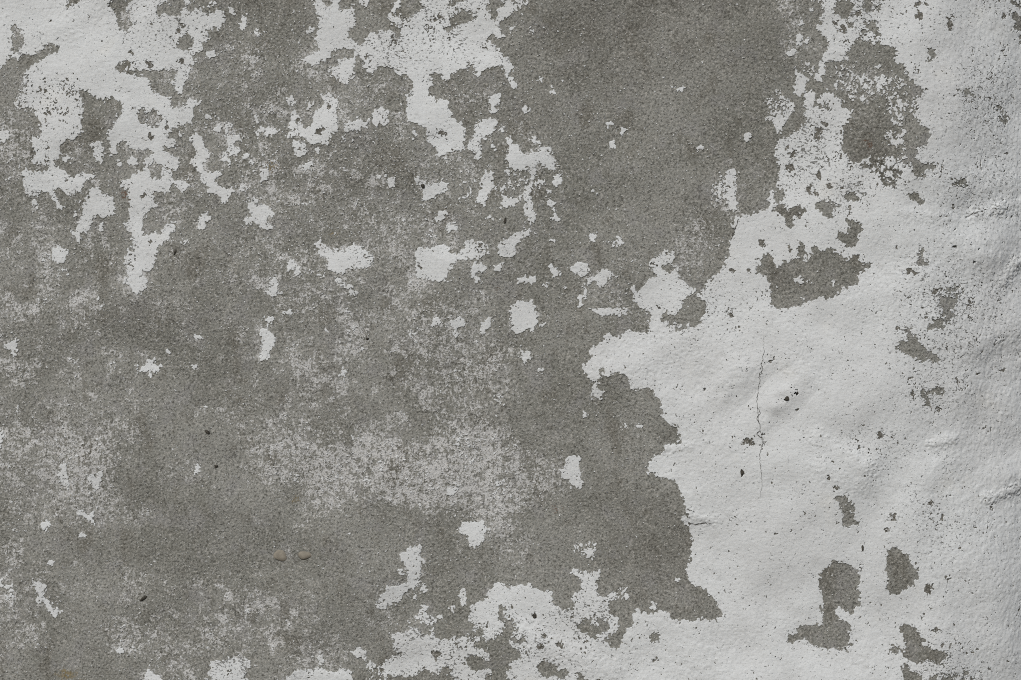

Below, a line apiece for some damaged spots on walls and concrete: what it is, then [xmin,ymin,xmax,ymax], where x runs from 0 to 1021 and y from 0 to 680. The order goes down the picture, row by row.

peeling [906,192,925,209]
peeling [729,387,808,456]
peeling [805,428,897,545]
peeling [838,402,939,487]
peeling [762,560,882,653]